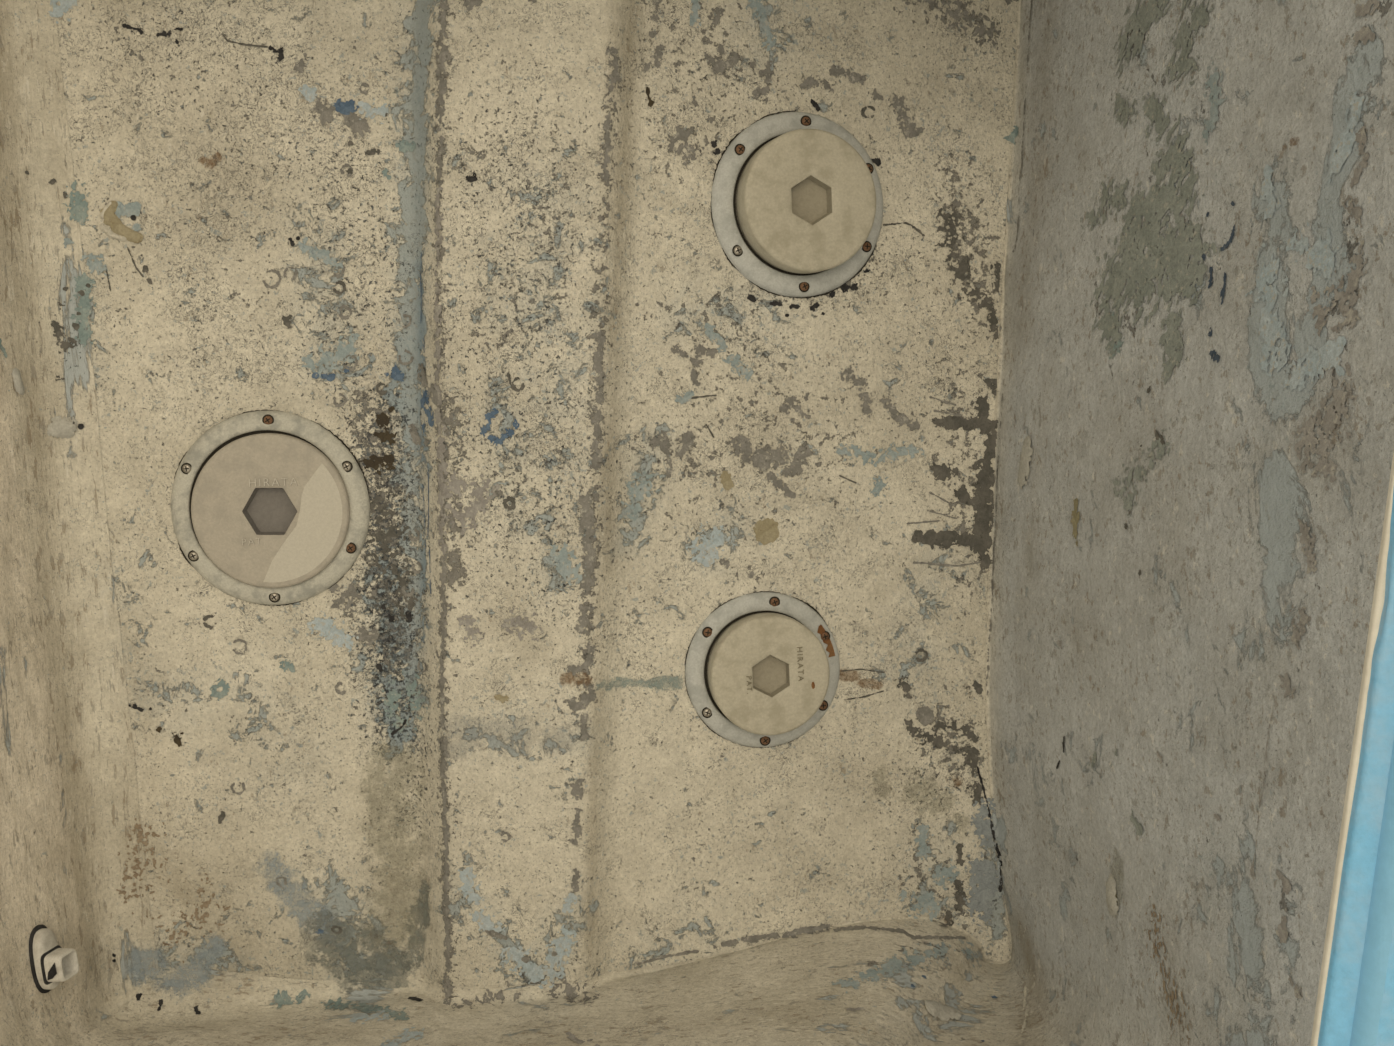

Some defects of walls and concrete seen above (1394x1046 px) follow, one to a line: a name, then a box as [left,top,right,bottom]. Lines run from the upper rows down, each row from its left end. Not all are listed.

peeling [1350,0,1379,55]
peeling [268,45,416,180]
peeling [288,236,343,273]
peeling [1080,0,1235,393]
peeling [1245,91,1369,491]
peeling [298,0,600,1011]
rust [817,625,883,689]